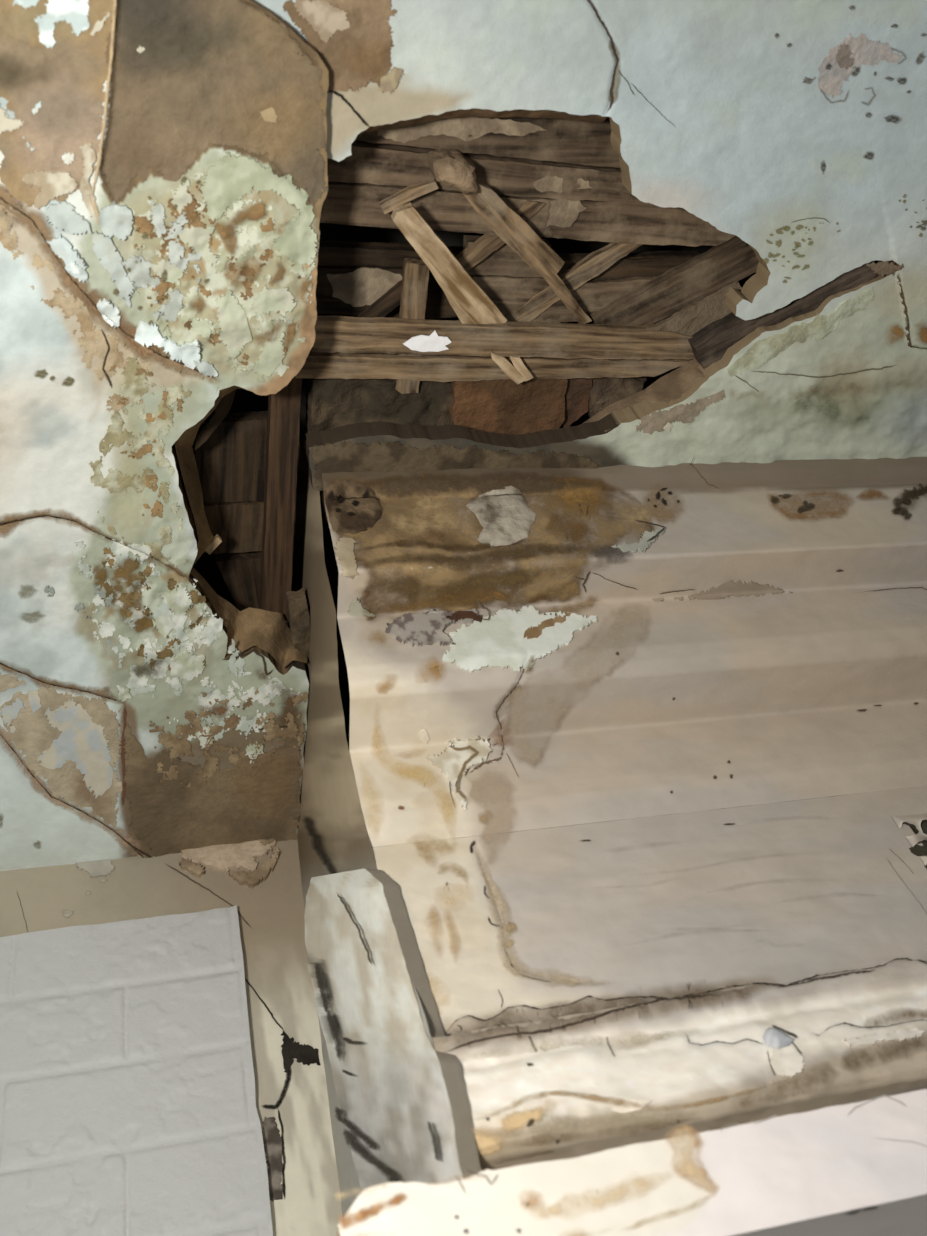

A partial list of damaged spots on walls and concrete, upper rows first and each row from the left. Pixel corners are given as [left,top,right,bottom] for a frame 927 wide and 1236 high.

flaking render [356,108,607,139]
flaking render [0,0,404,669]
crack [0,510,182,576]
leakage [327,474,680,620]
peeling [348,597,598,673]
crack [0,663,250,926]
flaking render [0,674,306,889]
leakage [483,873,581,986]
crack [451,886,926,1056]
crack [245,966,364,1198]
leakage [340,1194,405,1227]
leakage [474,1091,717,1191]